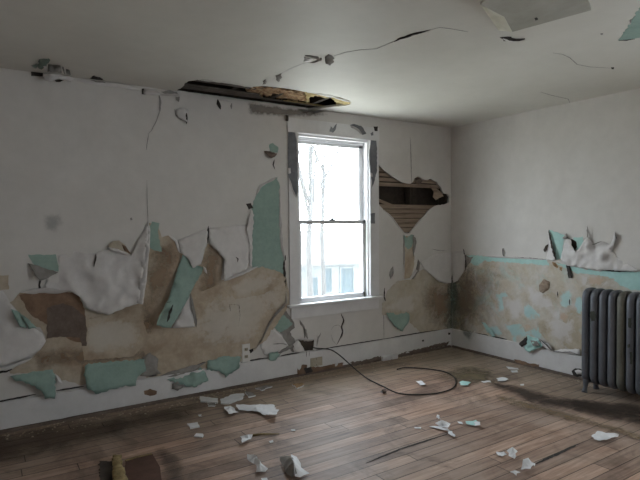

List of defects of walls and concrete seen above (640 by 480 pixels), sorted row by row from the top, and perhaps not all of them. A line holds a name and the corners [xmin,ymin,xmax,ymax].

peeling [618,8,640,41]
crack [263,27,467,84]
peeling [31,59,188,124]
crack [146,96,161,150]
peeling [350,124,640,356]
peeling [0,177,317,399]
crack [300,314,437,350]
crack [0,394,36,402]